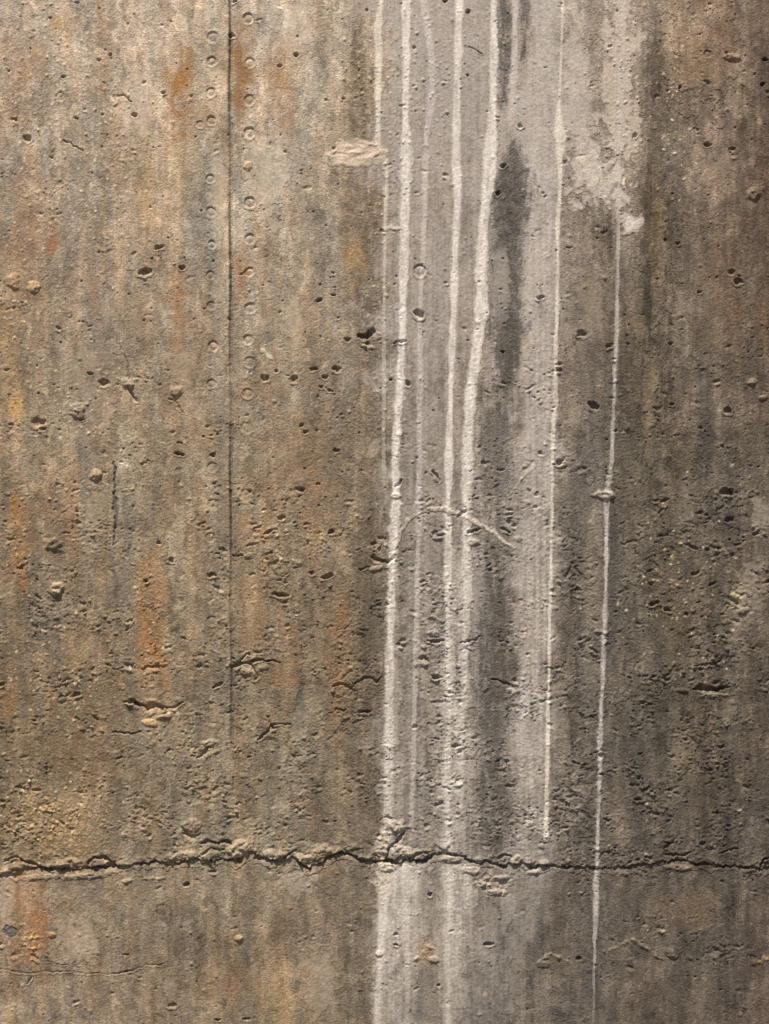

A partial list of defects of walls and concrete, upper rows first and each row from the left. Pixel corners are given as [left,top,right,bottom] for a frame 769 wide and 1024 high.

rust [123,29,203,350]
spalling [321,135,390,169]
rust [128,505,175,719]
crack [326,682,348,716]
leakage [294,0,688,1024]
crack [0,813,769,882]